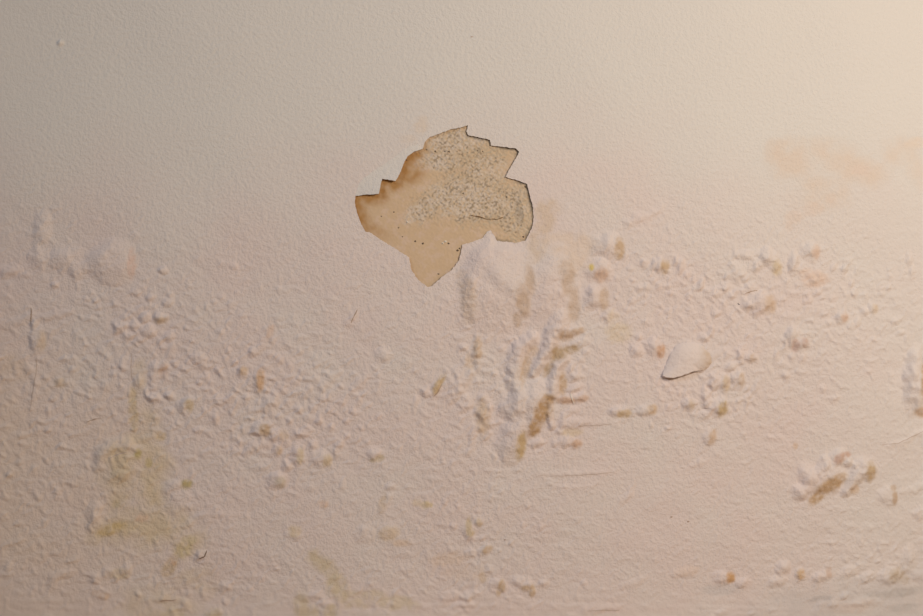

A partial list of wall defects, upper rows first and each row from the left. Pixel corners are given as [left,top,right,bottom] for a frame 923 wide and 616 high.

peeling [355,125,534,287]